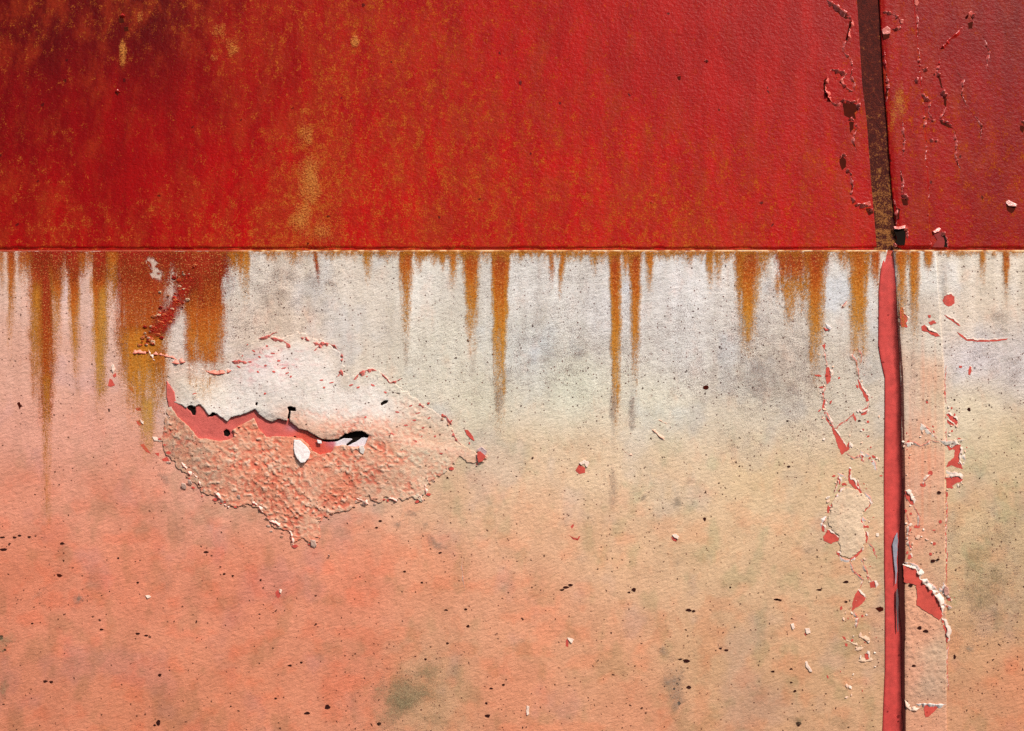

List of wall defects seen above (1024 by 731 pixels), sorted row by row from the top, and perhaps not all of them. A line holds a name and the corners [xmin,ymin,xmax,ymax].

peeling [823,0,861,133]
peeling [882,10,903,70]
peeling [915,10,975,142]
peeling [893,194,909,247]
peeling [921,315,940,337]
peeling [943,292,955,306]
corrosion [0,251,1021,486]
peeling [815,366,834,384]
peeling [820,380,880,562]
peeling [902,399,971,642]
peeling [842,574,883,621]
peeling [905,701,945,717]